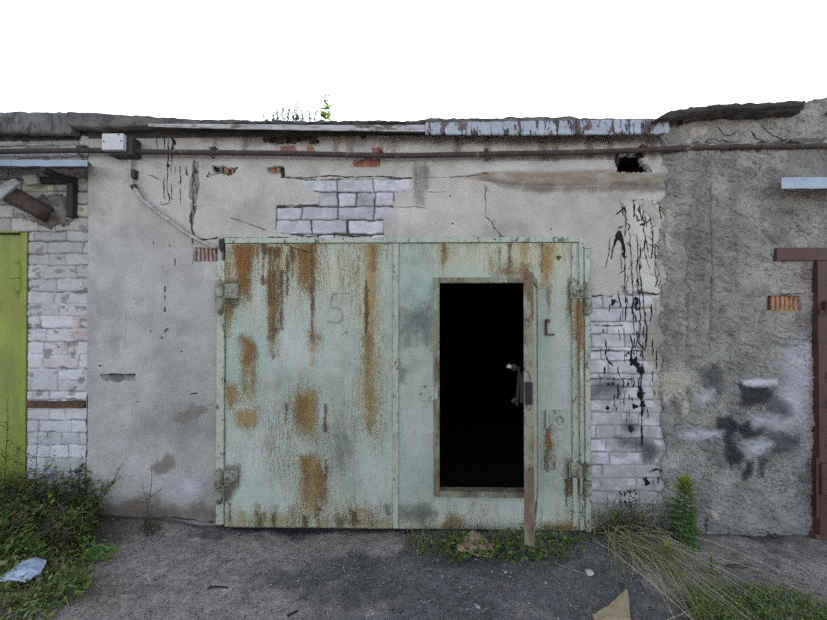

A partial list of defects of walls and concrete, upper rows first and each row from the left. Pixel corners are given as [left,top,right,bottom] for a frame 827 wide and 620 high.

flaking render [206,167,238,178]
crack [189,159,287,244]
flaking render [269,148,412,238]
spalling [614,153,645,173]
flaking render [192,238,226,264]
corrosion [227,244,318,360]
corrosion [364,245,375,371]
leakage [602,199,665,446]
corrosion [226,335,256,424]
corrosion [287,455,328,528]
flaking render [590,285,691,531]
leakage [738,416,798,480]